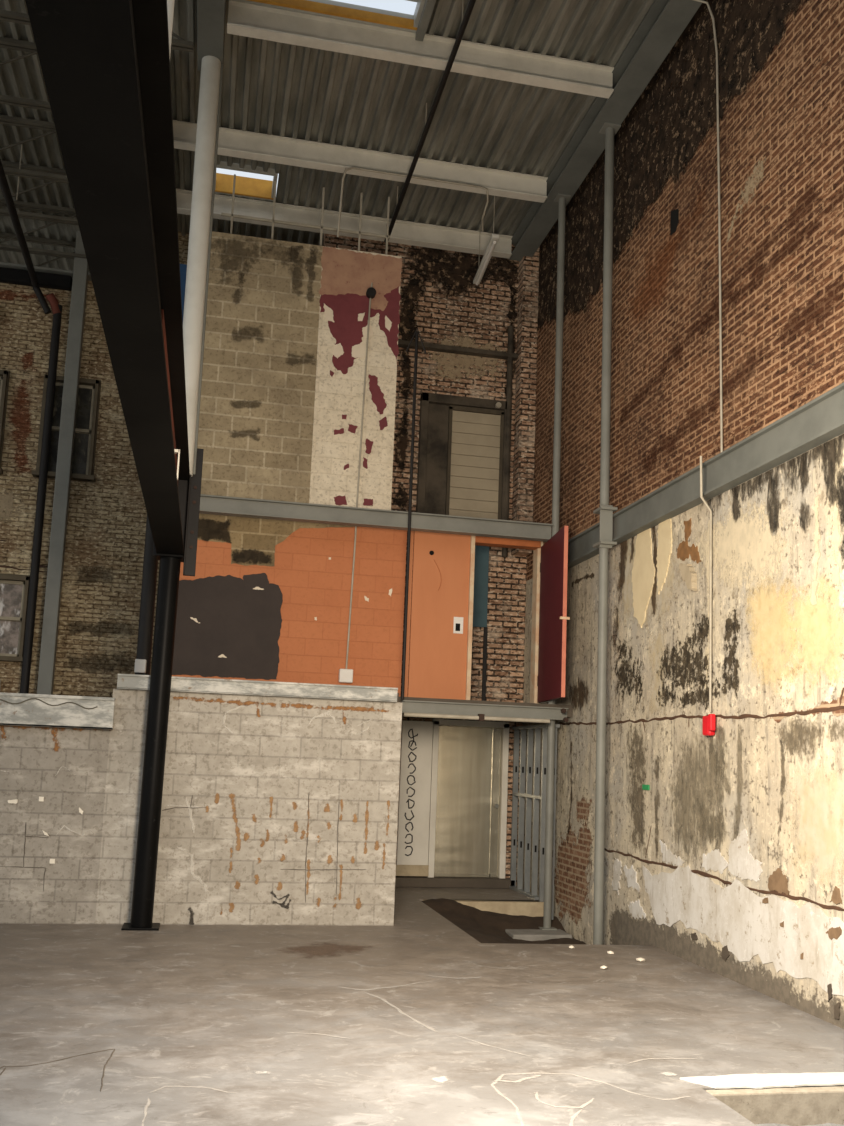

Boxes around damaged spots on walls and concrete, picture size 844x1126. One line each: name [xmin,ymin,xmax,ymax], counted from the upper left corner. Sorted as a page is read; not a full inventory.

damp [727,158,766,241]
peeling [319,247,402,377]
damp [620,187,844,421]
peeling [334,374,388,469]
damp [644,351,765,472]
damp [612,440,844,711]
crack [558,687,844,731]
corrosion [206,793,273,889]
corrosion [280,799,390,907]
spalling [554,795,593,925]
peeling [612,829,844,1020]
crack [0,1049,115,1092]